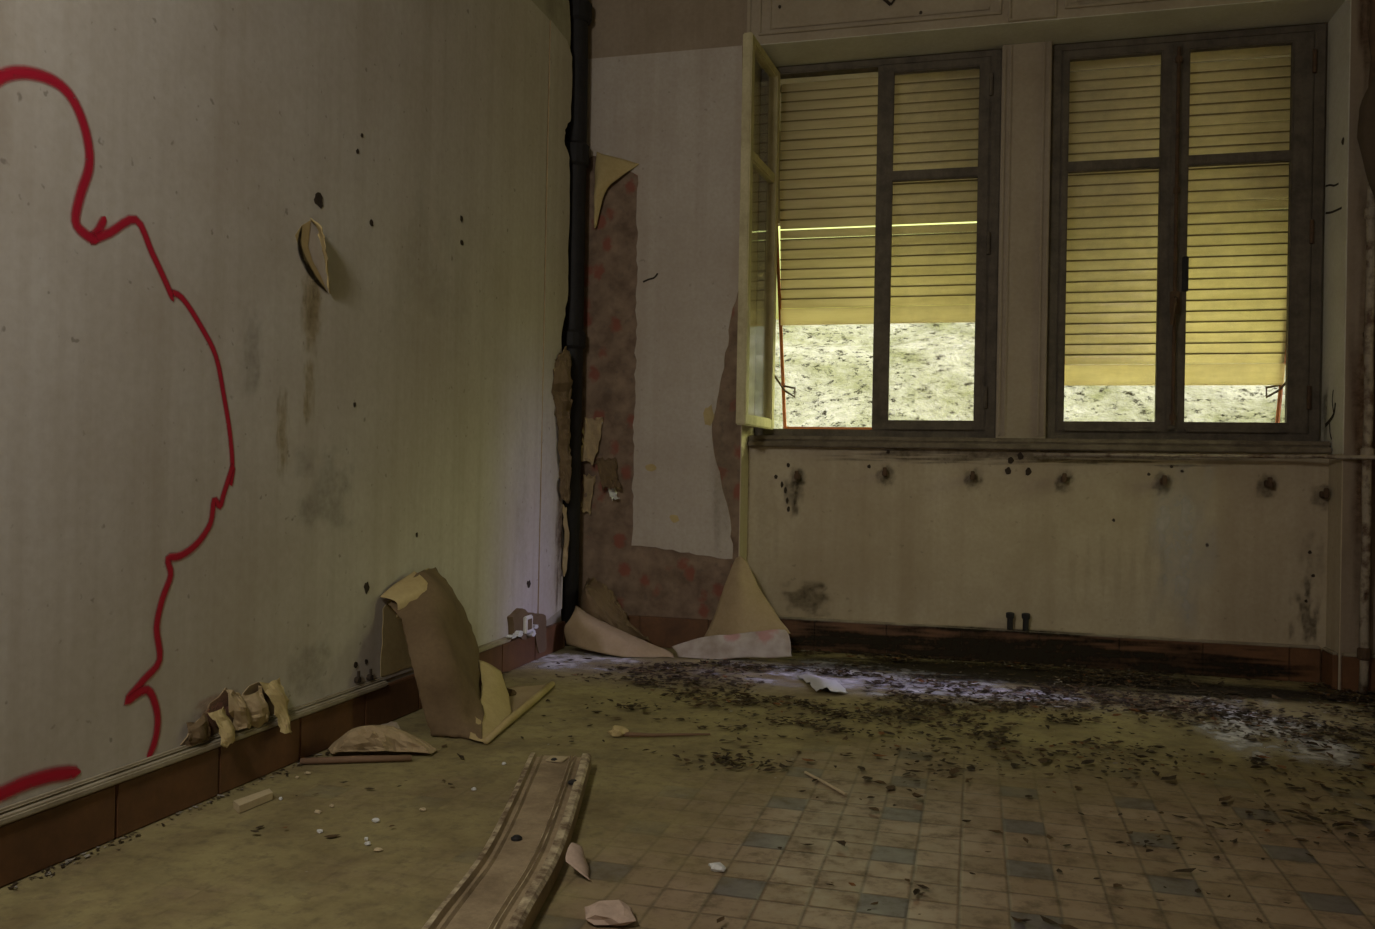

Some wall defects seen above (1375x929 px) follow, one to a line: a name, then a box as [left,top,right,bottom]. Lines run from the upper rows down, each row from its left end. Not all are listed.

peeling [295,217,331,294]
peeling [551,346,621,577]